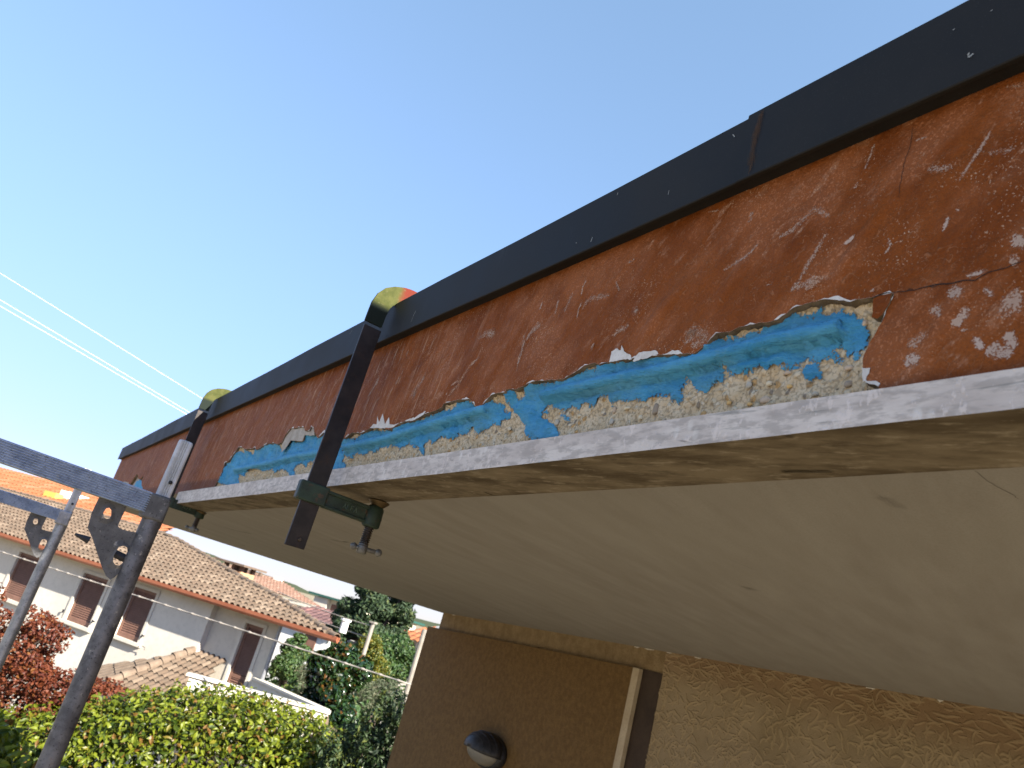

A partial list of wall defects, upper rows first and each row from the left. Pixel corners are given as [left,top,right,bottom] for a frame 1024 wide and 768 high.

crack [875,261,1023,297]
spalling [333,288,894,469]
spalling [214,426,325,487]